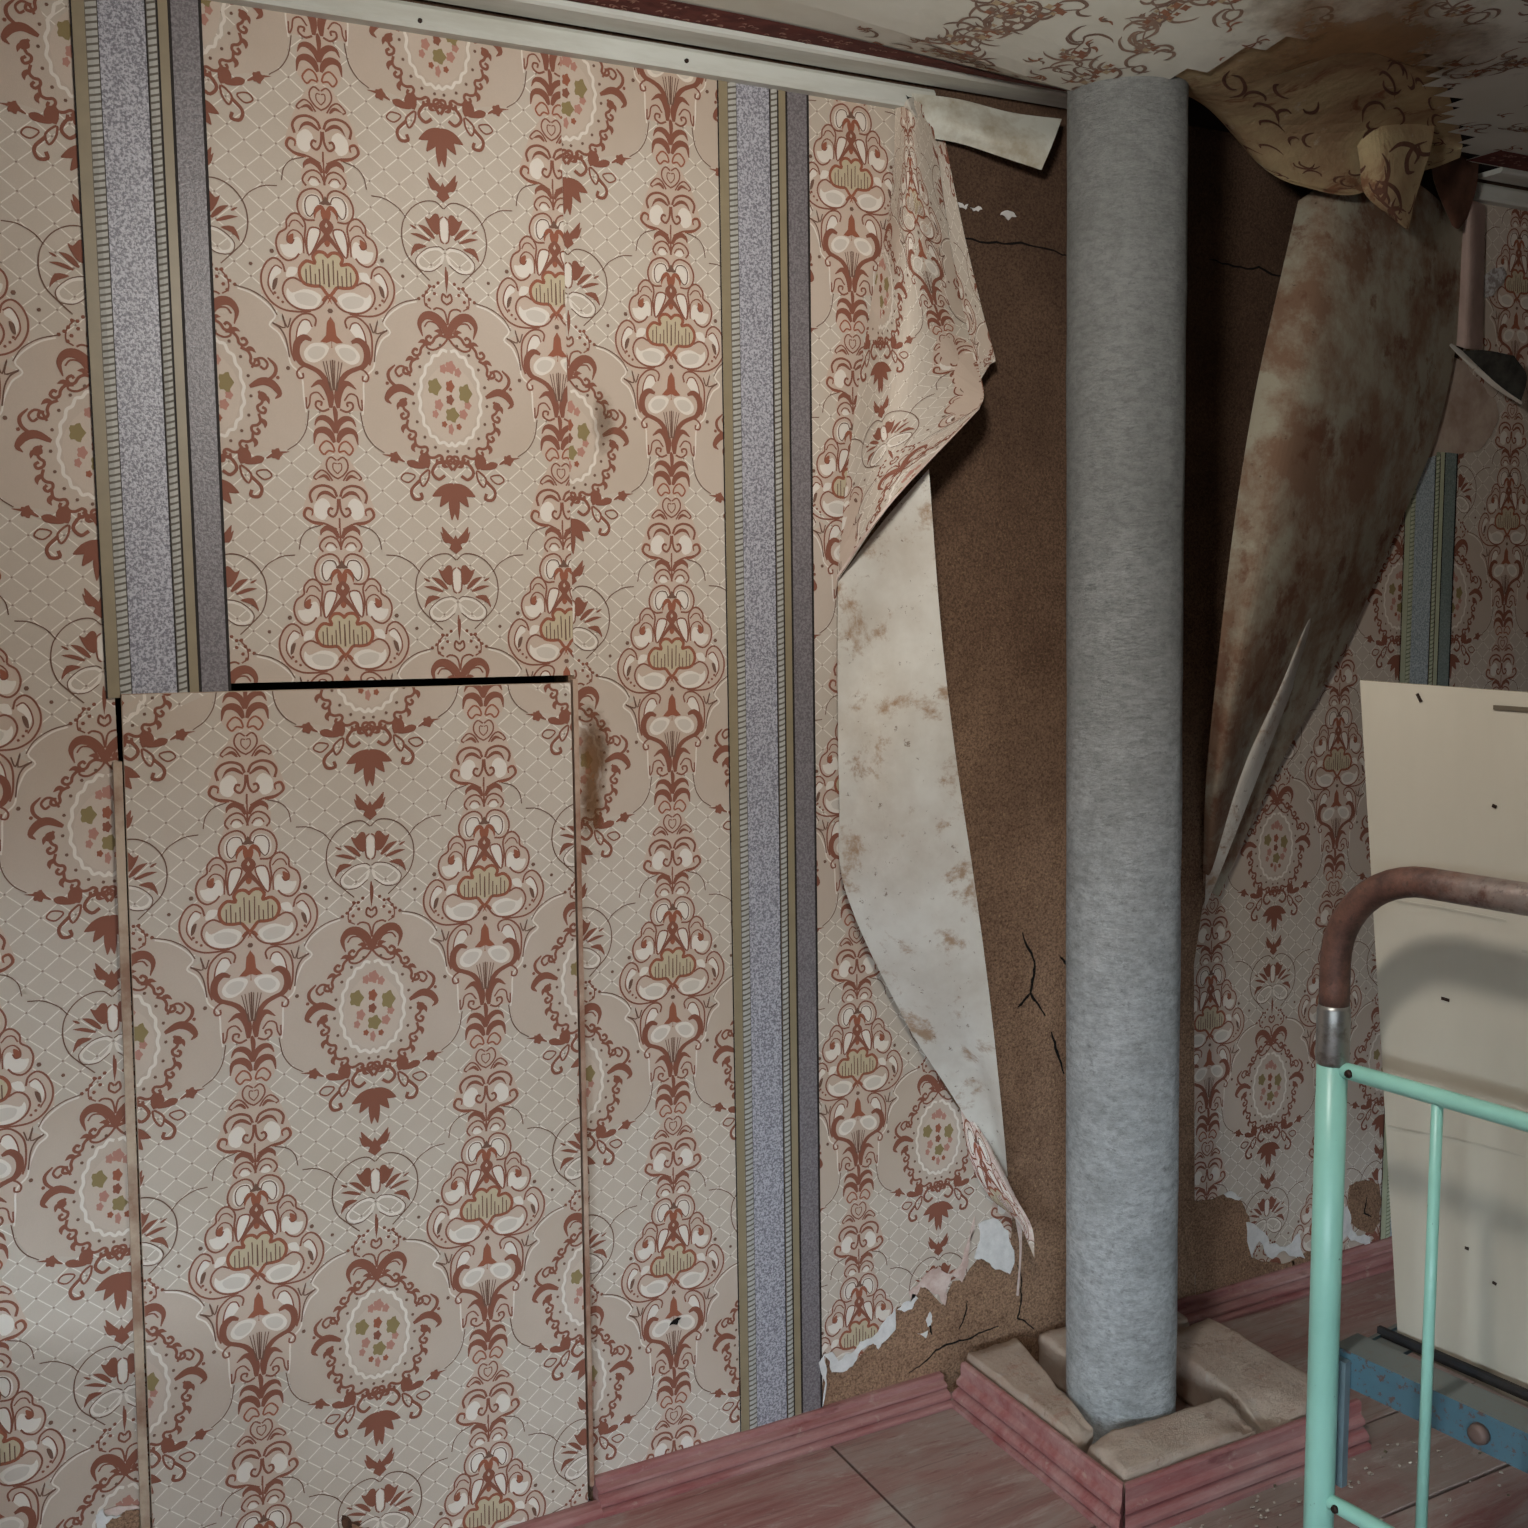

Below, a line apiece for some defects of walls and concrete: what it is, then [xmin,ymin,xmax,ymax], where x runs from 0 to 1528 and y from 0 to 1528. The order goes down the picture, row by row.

damp [1248,0,1486,74]
peeling [822,93,1067,1406]
peeling [1177,178,1314,1299]
crack [1018,932,1066,1074]
peeling [1343,1180,1382,1245]
peeling [95,1505,140,1528]